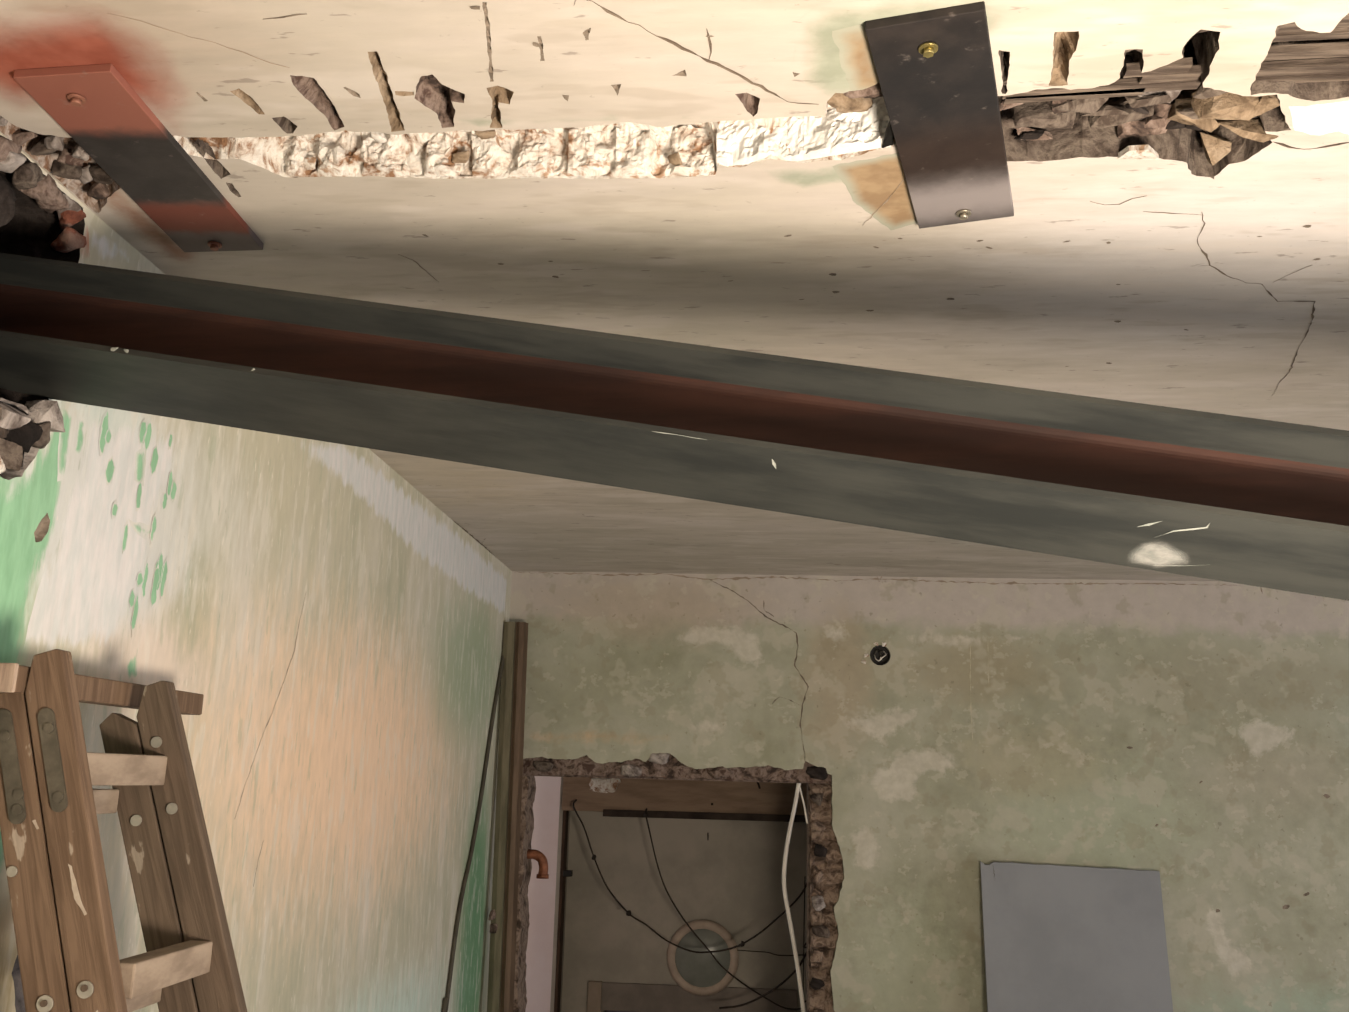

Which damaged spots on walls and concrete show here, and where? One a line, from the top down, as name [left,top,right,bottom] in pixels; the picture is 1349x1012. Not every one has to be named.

flaking render [0,116,154,266]
spalling [193,138,241,197]
spalling [230,89,297,134]
spalling [290,75,344,131]
crack [574,0,819,105]
spalling [735,93,760,116]
spalling [998,13,1349,179]
crack [1090,196,1315,391]
peeling [0,397,182,682]
crack [454,521,1277,763]
peeling [835,699,967,809]
spalling [513,753,844,1012]